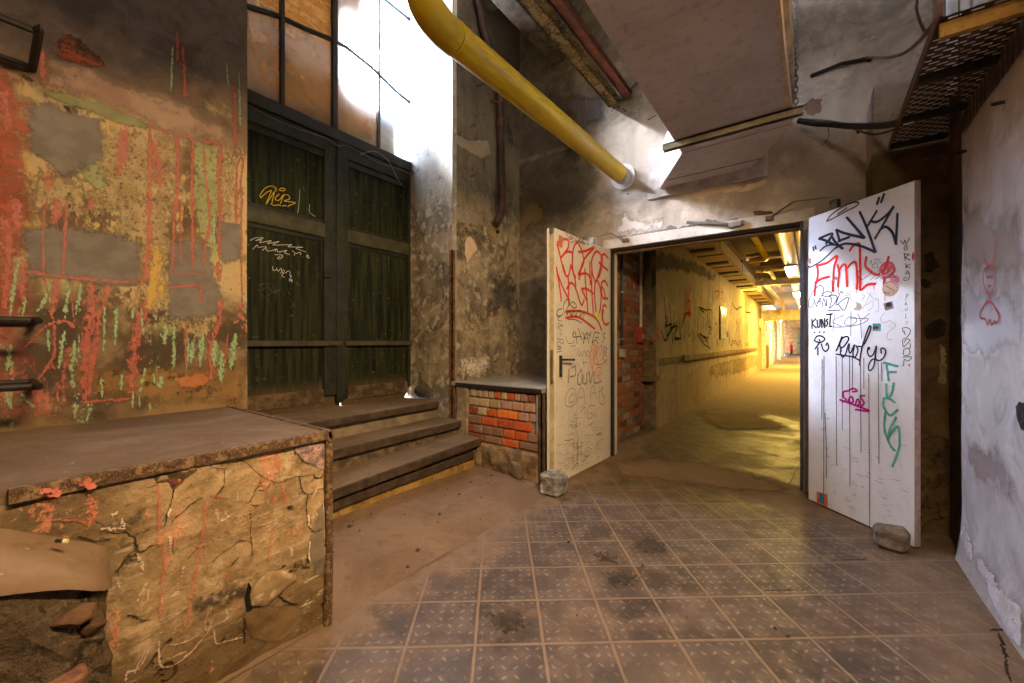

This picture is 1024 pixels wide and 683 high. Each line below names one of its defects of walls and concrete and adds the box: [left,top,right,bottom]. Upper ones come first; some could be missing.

spalling [55,34,104,69]
spalling [619,218,738,238]
crack [77,446,324,644]